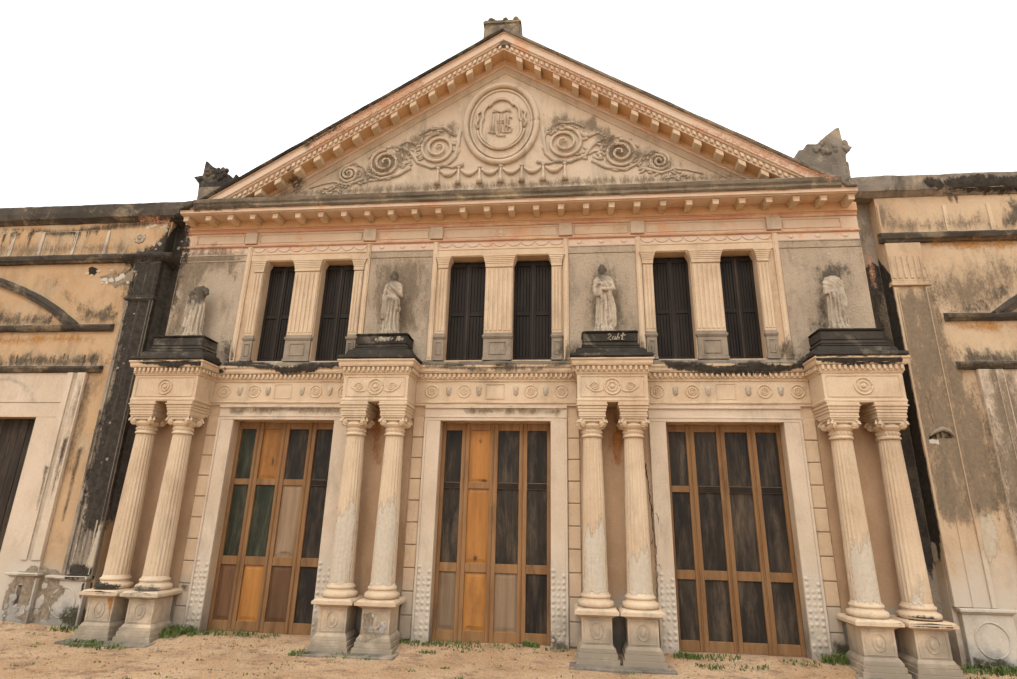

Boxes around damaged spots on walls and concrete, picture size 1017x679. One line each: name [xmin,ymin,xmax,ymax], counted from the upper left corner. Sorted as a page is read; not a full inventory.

leakage [923,174,1017,227]
spalling [85,266,137,288]
leakage [924,262,1016,312]
leakage [965,348,1017,365]
leakage [0,202,249,594]
spalling [2,565,65,623]